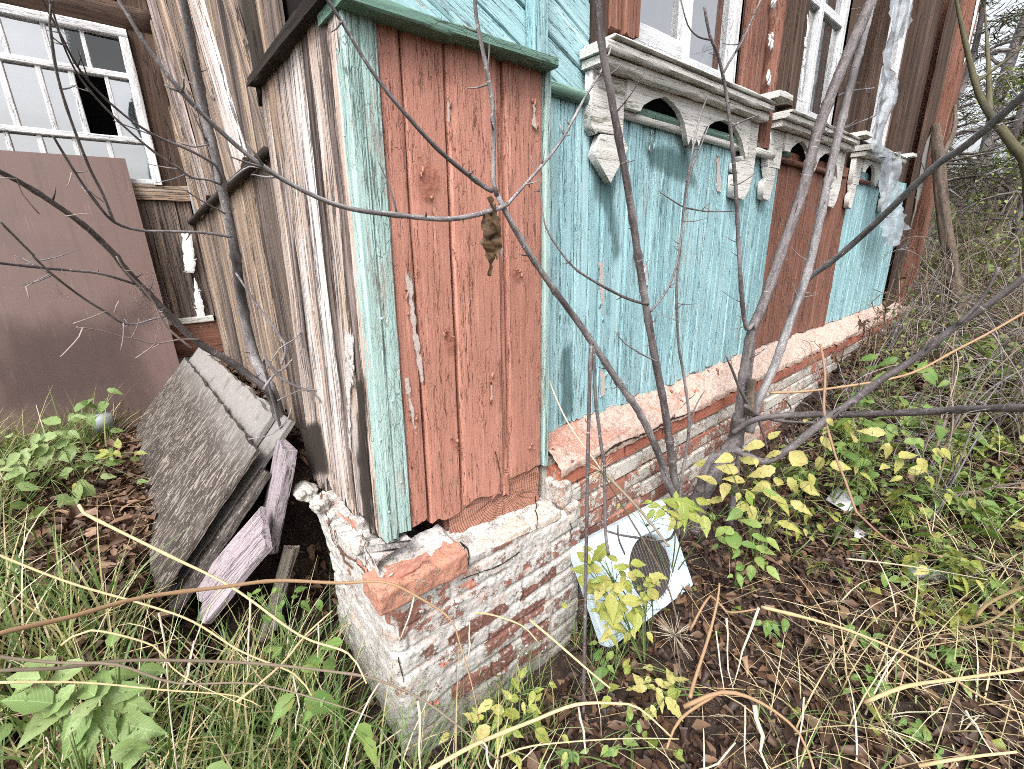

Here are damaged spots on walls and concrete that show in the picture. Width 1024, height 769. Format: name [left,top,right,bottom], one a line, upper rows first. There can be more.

peeling [405,274,424,434]
flaking render [732,398,788,463]
flaking render [576,417,732,540]
spalling [334,510,357,531]
spalling [383,551,428,581]
spalling [397,609,426,642]
spalling [420,566,556,707]